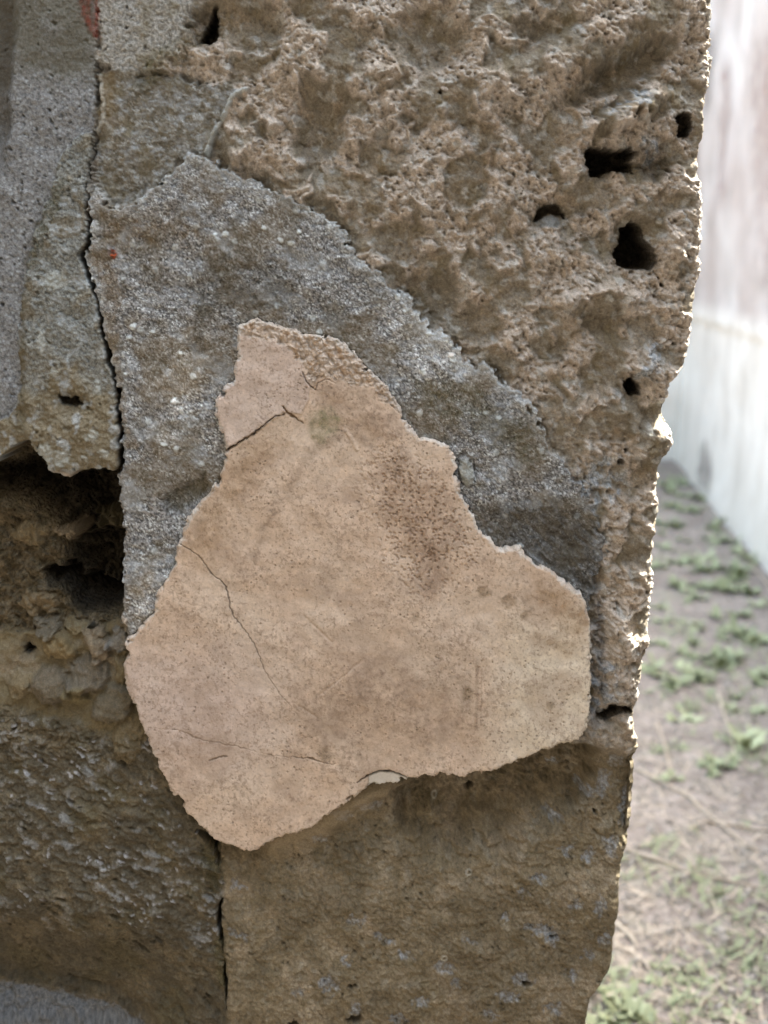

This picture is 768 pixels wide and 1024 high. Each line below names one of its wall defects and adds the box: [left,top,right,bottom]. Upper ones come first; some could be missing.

crack [81,0,125,475]
crack [226,406,304,453]
spalling [0,440,126,634]
crack [181,544,297,714]
crack [148,728,334,766]
crack [196,828,229,1023]